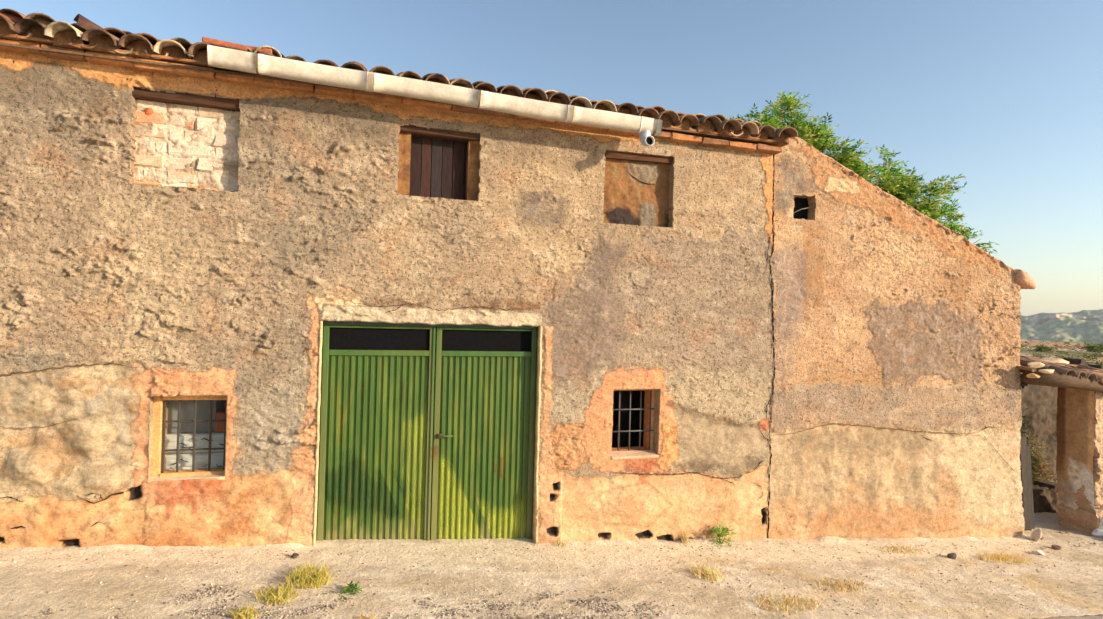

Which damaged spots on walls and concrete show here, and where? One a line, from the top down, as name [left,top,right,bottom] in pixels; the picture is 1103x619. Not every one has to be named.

peeling [0,51,640,143]
peeling [630,162,658,182]
peeling [640,203,656,226]
peeling [0,289,363,549]
peeling [537,326,769,544]
crack [613,154,1014,538]